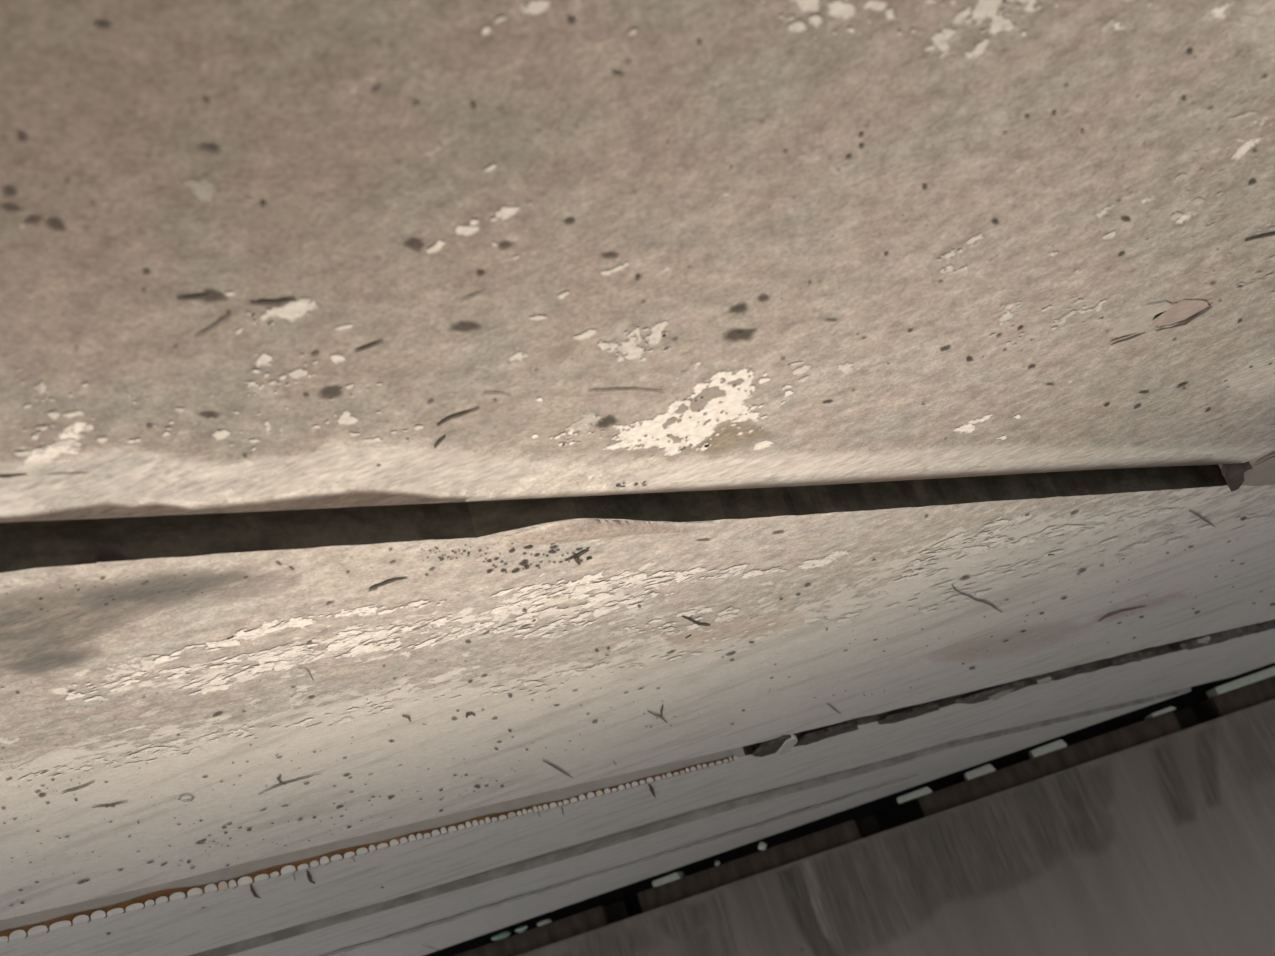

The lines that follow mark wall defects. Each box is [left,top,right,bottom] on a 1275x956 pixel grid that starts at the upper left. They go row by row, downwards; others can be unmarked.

peeling [779,0,916,38]
peeling [924,0,1059,62]
peeling [124,407,270,458]
peeling [350,426,424,443]
peeling [532,362,812,459]
leakage [0,554,312,688]
peeling [65,549,851,702]
crack [1098,606,1146,622]
rust [0,756,734,942]